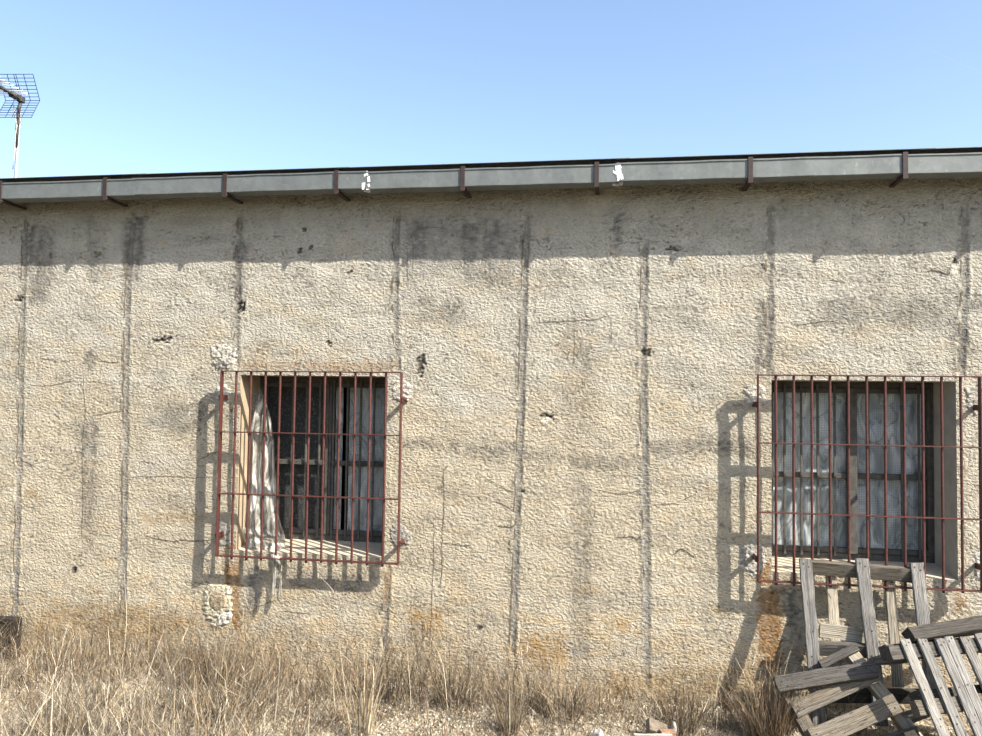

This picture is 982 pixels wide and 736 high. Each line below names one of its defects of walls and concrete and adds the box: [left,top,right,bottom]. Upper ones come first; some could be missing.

peeling [202,584,235,630]
rust [757,565,781,675]